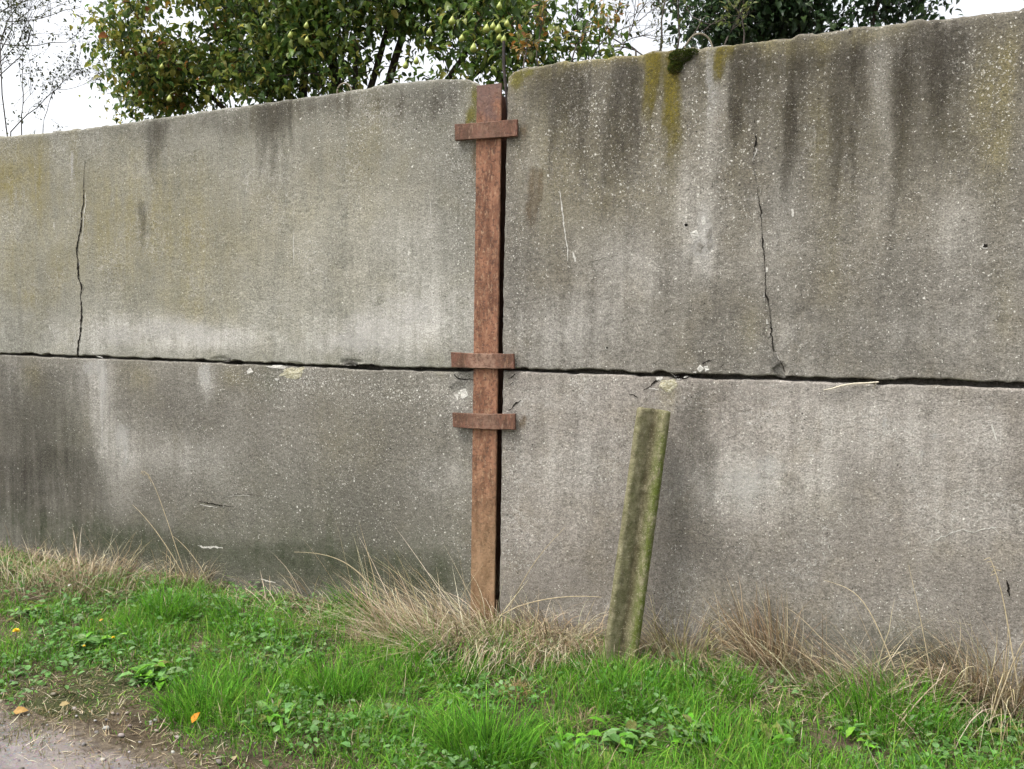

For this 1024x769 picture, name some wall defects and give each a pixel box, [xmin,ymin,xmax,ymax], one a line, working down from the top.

water stain [642,51,681,156]
crack [74,154,87,357]
crack [752,120,786,378]